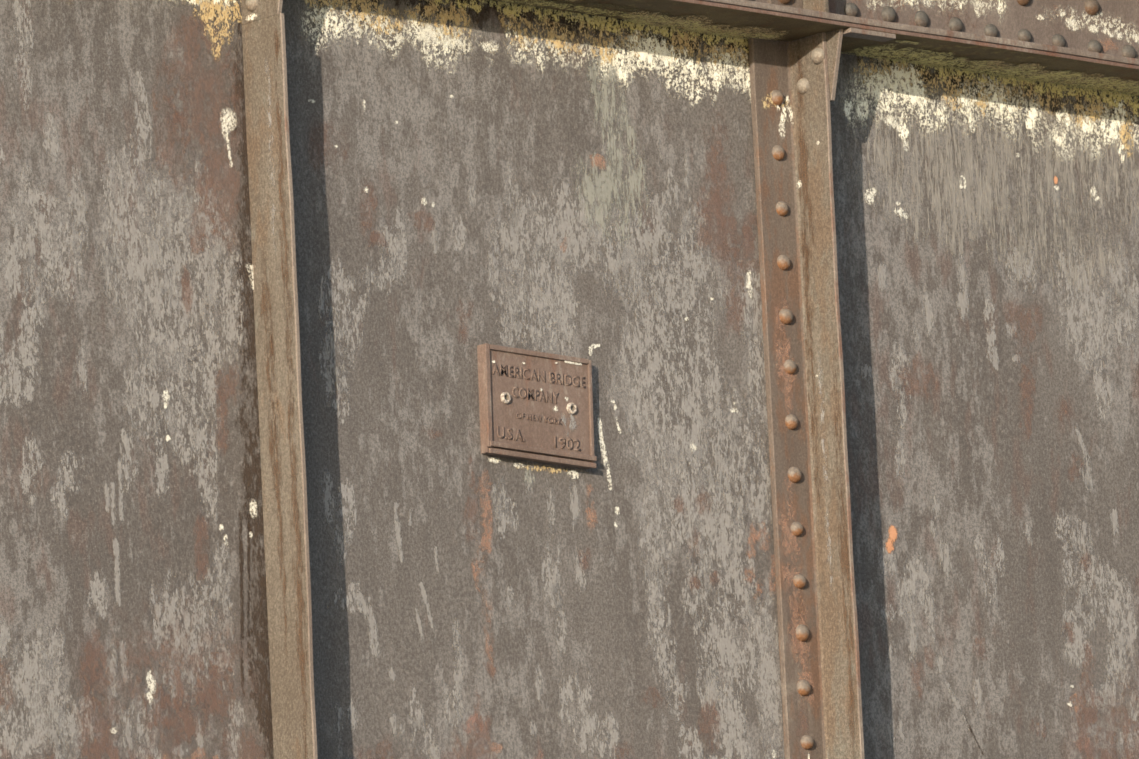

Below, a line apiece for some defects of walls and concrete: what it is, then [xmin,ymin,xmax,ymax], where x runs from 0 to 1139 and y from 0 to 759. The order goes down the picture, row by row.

peeling [186,0,242,57]
leakage [302,0,751,243]
efflorescence [937,0,1003,14]
leakage [844,55,1139,292]
efflorescence [1069,9,1139,42]
peeling [0,70,252,759]
peeling [316,206,408,425]
peeling [488,141,782,759]
peeling [957,255,1031,371]
peeling [1052,241,1139,427]
peeling [878,495,961,710]
peeling [1054,509,1139,759]